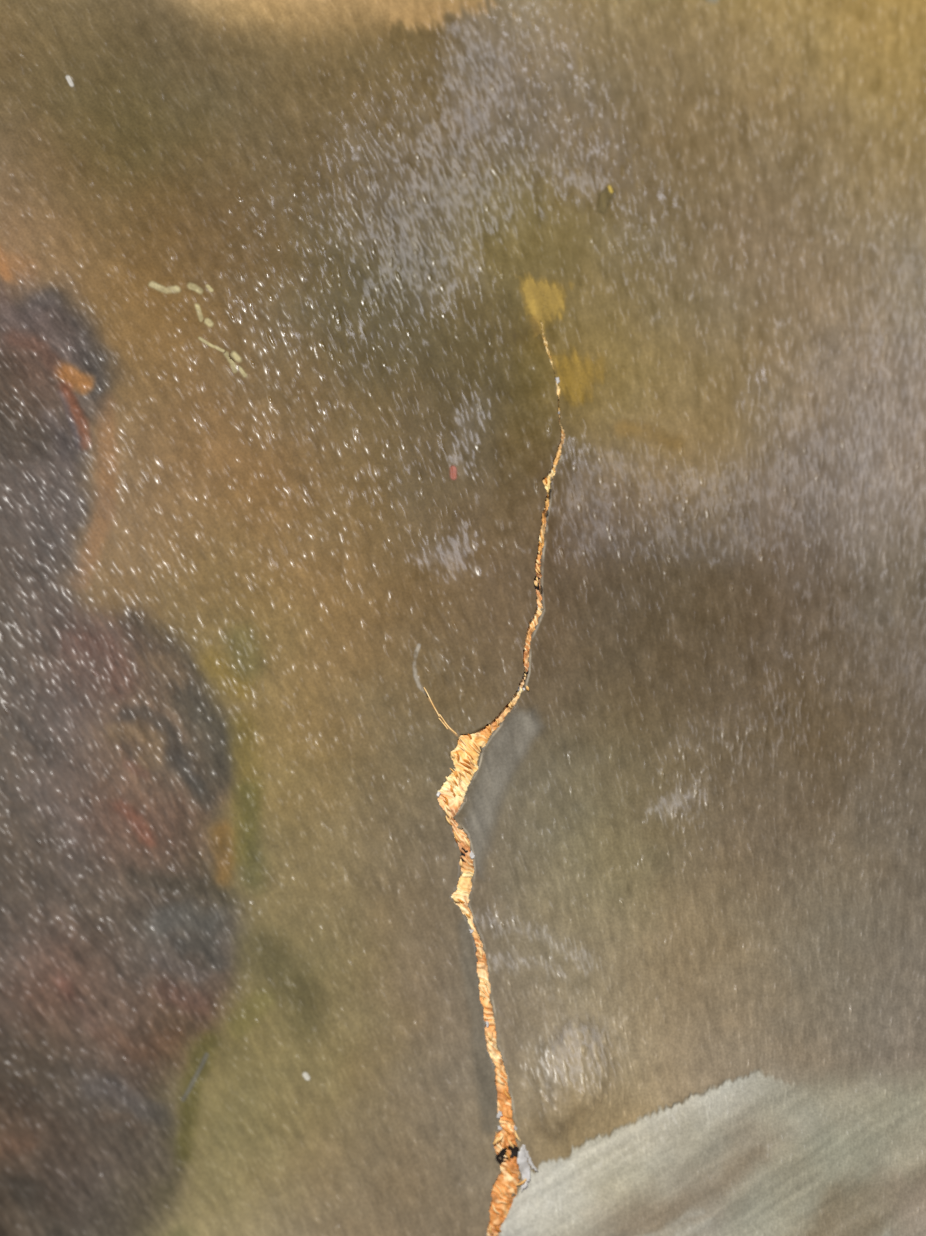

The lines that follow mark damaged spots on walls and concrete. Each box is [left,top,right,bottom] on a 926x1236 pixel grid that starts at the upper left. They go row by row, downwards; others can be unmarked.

water stain [522,277,565,331]
crack [414,322,565,1236]